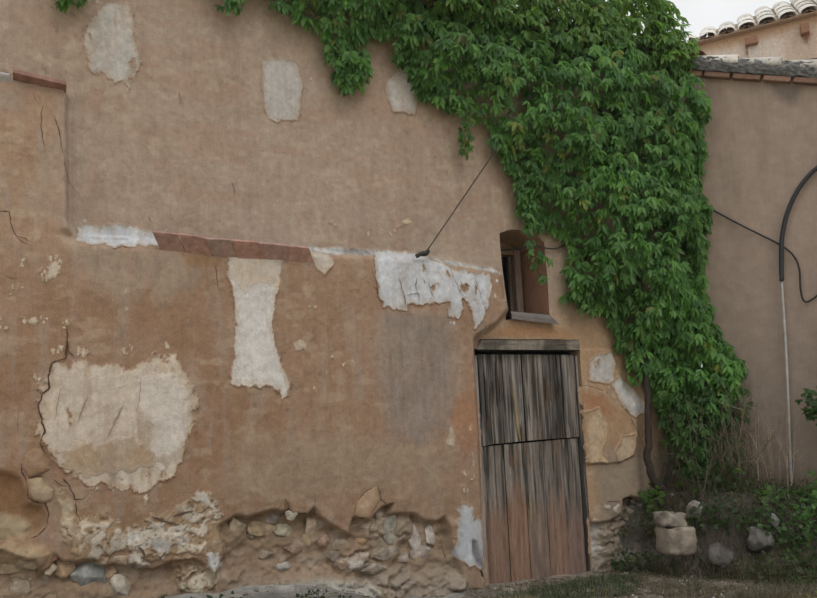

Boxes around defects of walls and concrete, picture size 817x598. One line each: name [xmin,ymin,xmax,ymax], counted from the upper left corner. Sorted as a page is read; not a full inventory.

flaking render [80,0,143,93]
flaking render [259,56,313,125]
flaking render [383,65,419,117]
crack [33,94,87,205]
water stain [703,72,817,273]
flaking render [72,220,183,250]
flaking render [224,256,293,401]
flaking render [371,249,498,334]
crack [17,323,86,538]
flaking render [0,341,485,598]
flaking render [580,348,645,466]